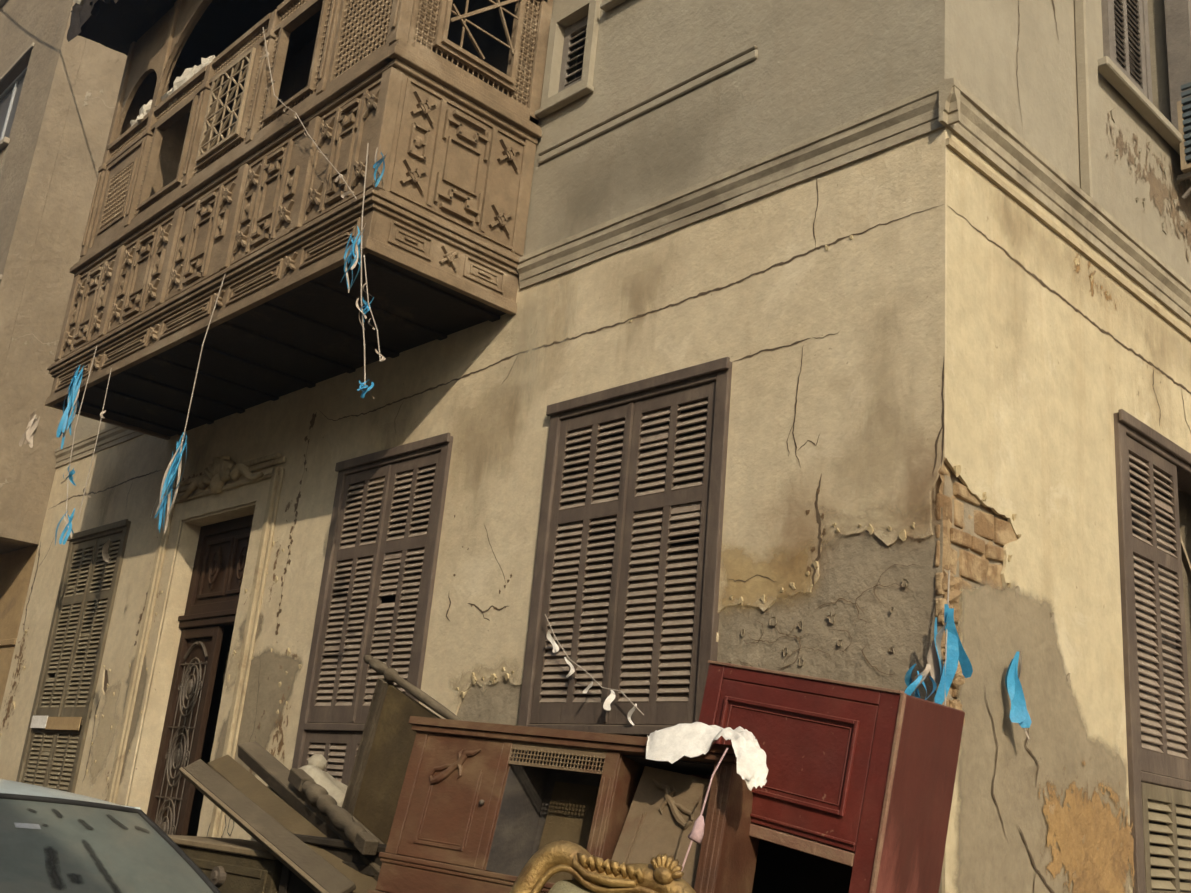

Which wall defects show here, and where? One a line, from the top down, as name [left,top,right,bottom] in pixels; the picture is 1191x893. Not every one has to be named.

flaking render [1106,108,1191,263]
crack [320,178,1191,432]
crack [23,541,53,632]
crack [48,470,160,510]
spalling [266,412,317,635]
crack [446,525,512,621]
crack [733,333,838,589]
peeling [717,461,1021,726]
crack [932,361,944,473]
spalling [0,623,29,737]
peeling [453,662,522,726]
spalling [1038,761,1135,893]